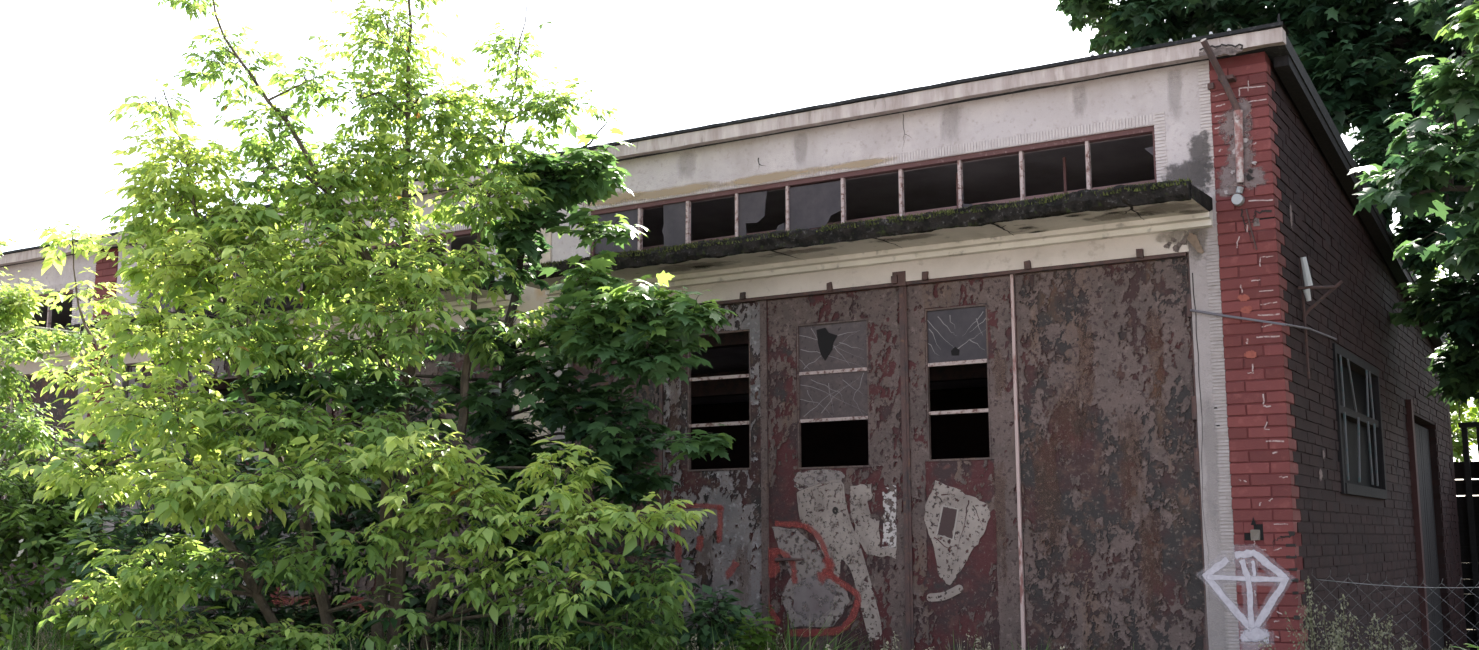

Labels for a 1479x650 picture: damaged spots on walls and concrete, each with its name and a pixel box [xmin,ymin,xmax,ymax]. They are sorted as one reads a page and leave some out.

damp [1166,130,1213,192]
spalling [1212,81,1274,248]
peeling [1237,256,1280,374]
peeling [574,232,1205,650]